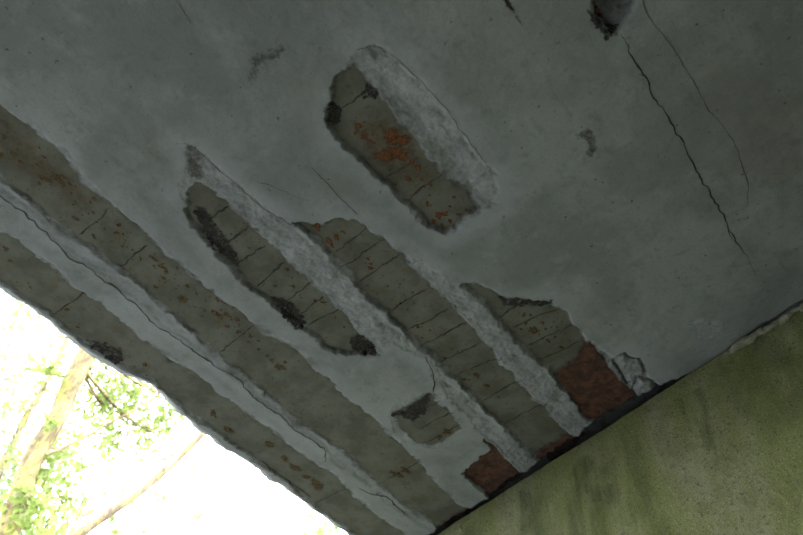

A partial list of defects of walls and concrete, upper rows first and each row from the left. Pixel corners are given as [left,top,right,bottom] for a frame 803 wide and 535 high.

spalling [591,0,640,37]
crack [186,144,309,227]
spalling [327,43,503,238]
crack [620,0,756,275]
crack [0,196,327,463]
spalling [0,103,661,535]
spalling [722,300,803,358]
crack [261,460,310,497]